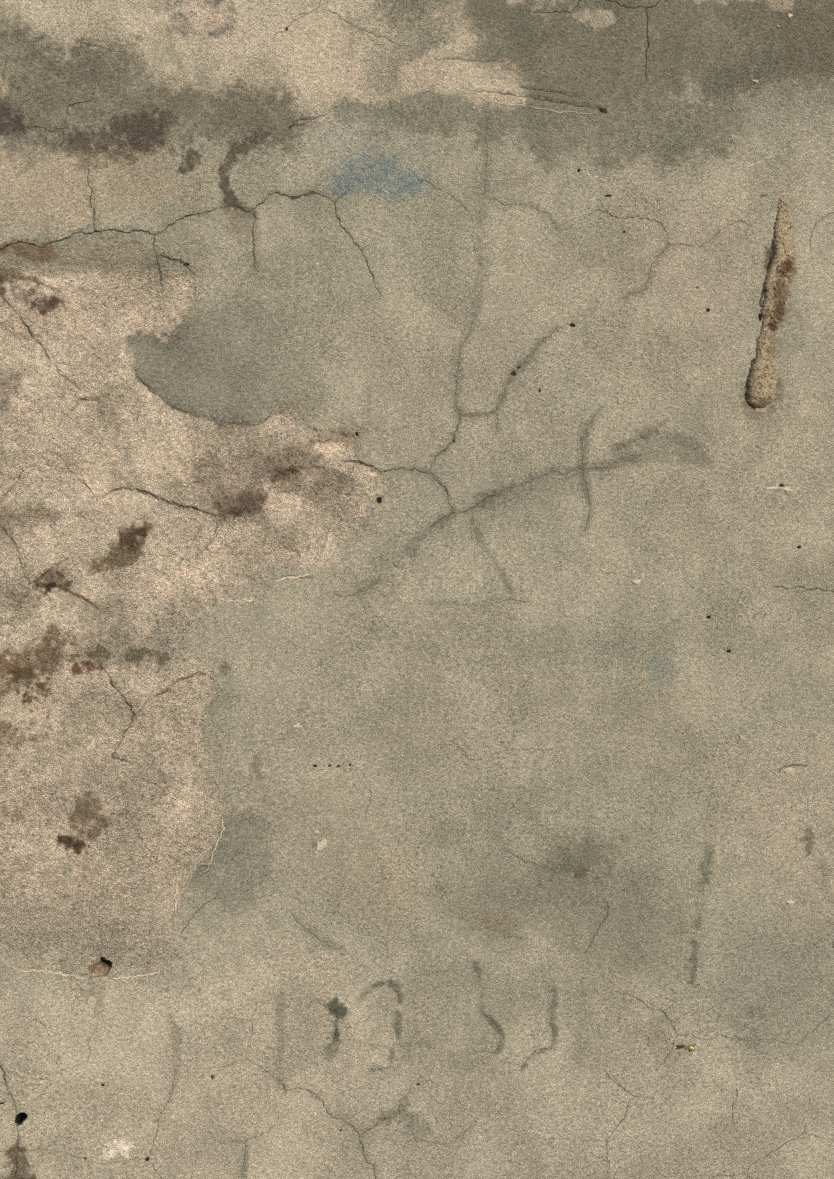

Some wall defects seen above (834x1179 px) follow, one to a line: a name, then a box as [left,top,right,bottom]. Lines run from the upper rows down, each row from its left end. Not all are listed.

crack [0,169,379,295]
crack [427,116,752,297]
crack [0,292,107,415]
crack [135,369,188,413]
leakage [0,0,834,613]
crack [346,320,605,528]
crack [0,470,98,609]
crack [54,452,218,551]
flaking render [0,269,385,983]
leakage [0,1135,43,1179]
crack [0,1004,474,1179]
crack [620,993,834,1069]